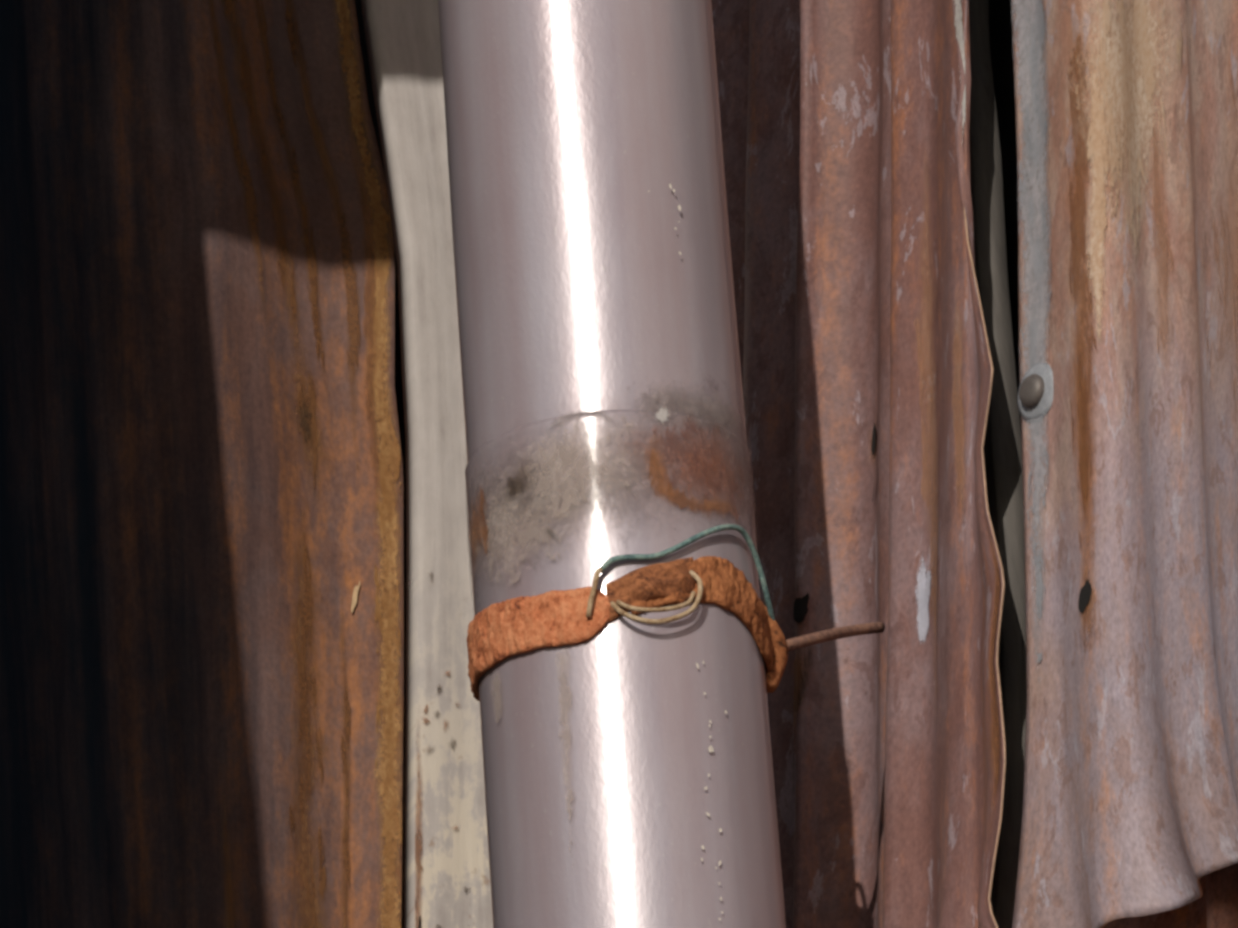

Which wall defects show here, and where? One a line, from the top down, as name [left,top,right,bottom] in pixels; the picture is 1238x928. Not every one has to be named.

corrosion [655,408,669,422]
corrosion [914,318,939,632]
corrosion [1067,34,1097,647]